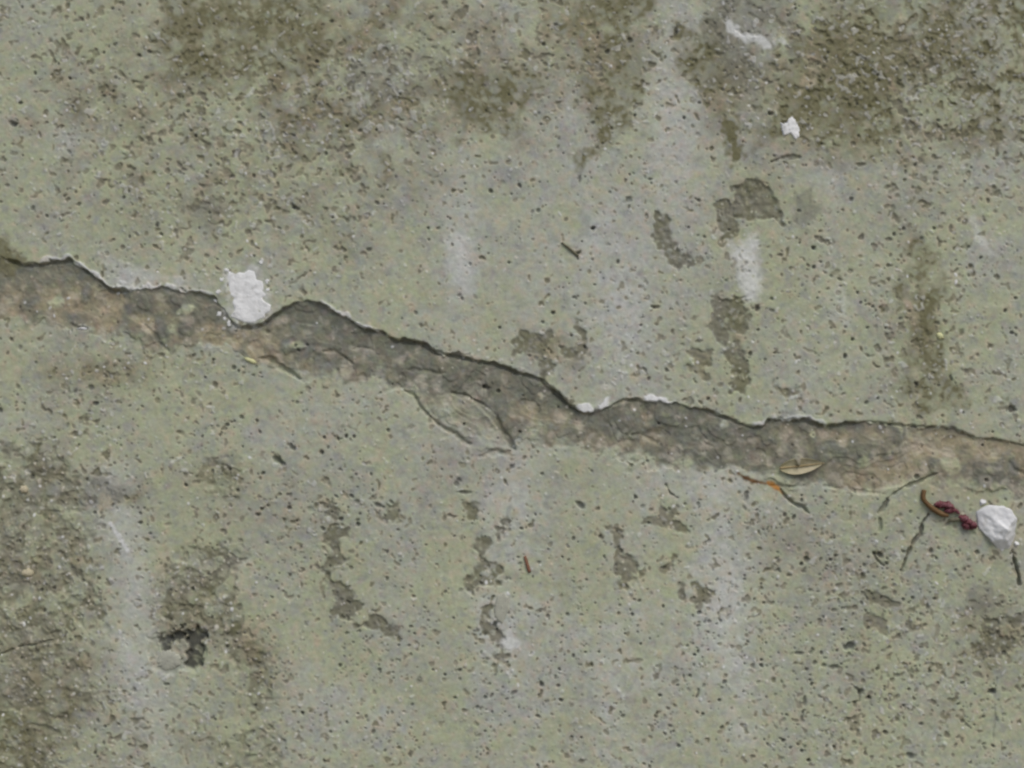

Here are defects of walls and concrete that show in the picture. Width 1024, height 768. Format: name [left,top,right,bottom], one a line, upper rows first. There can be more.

water stain [725,19,787,49]
water stain [729,233,763,302]
peeling [510,319,591,380]
peeling [686,294,752,394]
crack [0,254,1024,572]
peeling [772,382,799,398]
spalling [195,451,242,506]